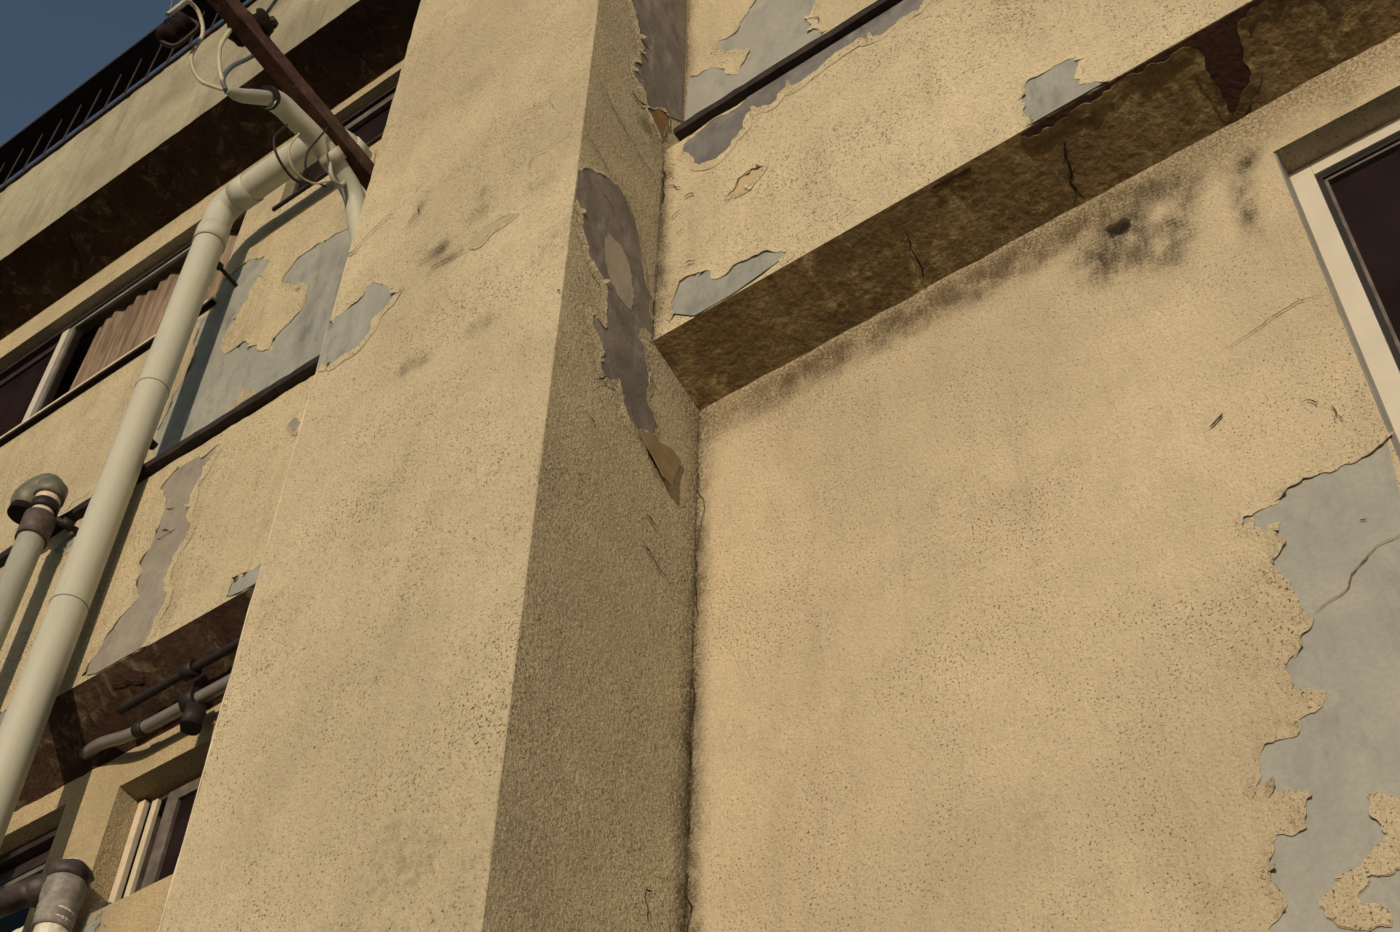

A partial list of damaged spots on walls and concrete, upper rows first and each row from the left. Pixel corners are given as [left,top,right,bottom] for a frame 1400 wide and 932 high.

peeling [153,227,404,458]
peeling [574,160,798,486]
peeling [627,0,932,171]
crack [904,230,924,280]
water stain [728,164,1201,422]
crack [1061,137,1085,200]
peeling [81,439,225,676]
peeling [226,561,264,597]
water stain [677,638,703,932]
peeling [1230,430,1400,932]